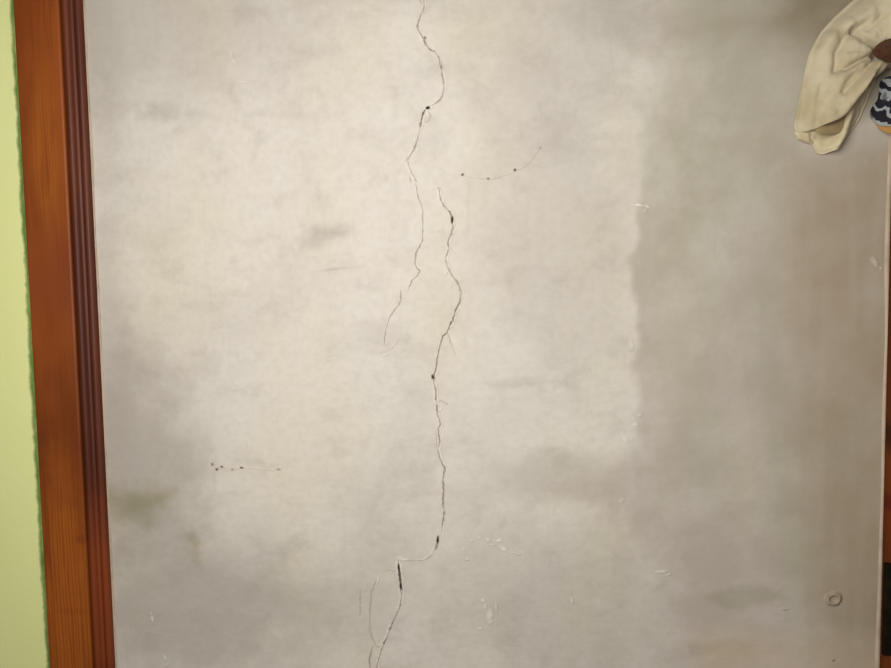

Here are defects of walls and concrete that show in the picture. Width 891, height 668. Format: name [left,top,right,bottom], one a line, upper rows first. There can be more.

crack [461,142,544,180]
crack [359,0,462,668]
water stain [108,468,192,540]